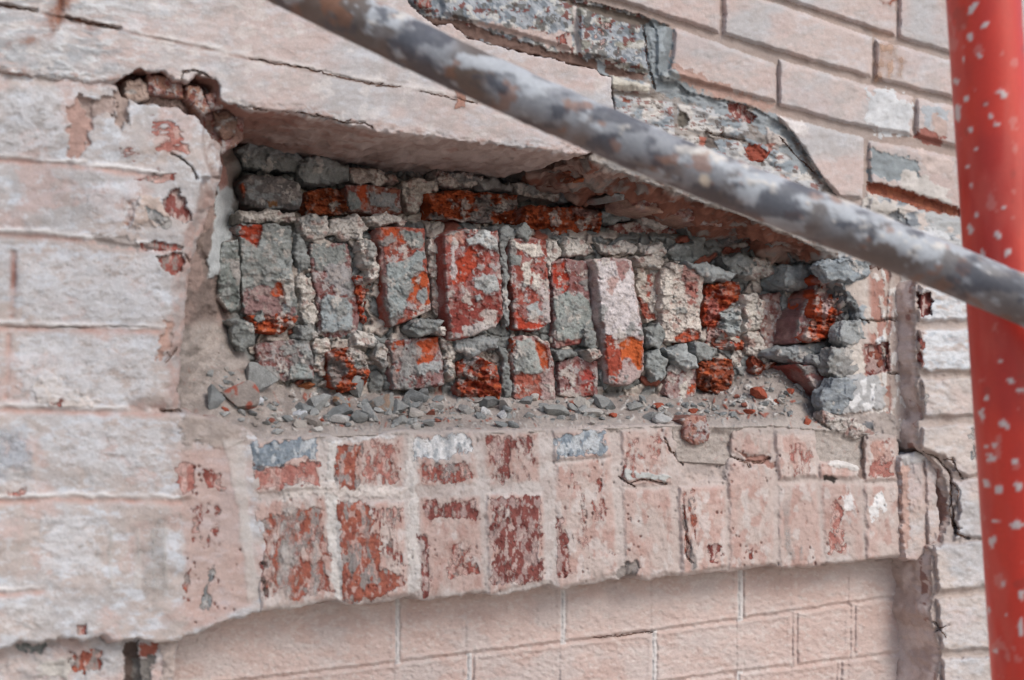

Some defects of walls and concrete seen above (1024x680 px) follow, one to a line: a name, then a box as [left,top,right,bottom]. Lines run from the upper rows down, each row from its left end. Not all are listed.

crack [0,3,35,12]
crack [65,17,119,29]
spalling [114,74,894,610]
crack [923,451,966,538]